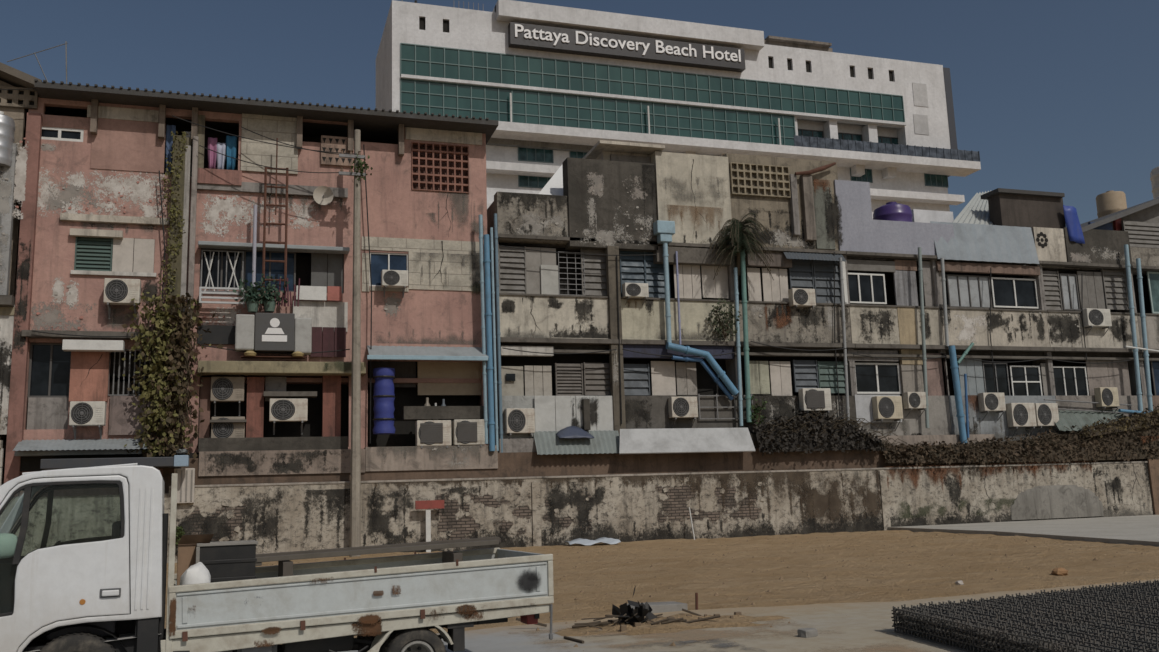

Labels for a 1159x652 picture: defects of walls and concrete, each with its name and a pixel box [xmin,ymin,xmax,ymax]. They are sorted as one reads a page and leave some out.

peeling [12,138,168,219]
peeling [198,193,319,239]
water stain [429,192,484,233]
water stain [499,192,568,237]
water stain [585,198,597,240]
water stain [0,238,31,429]
water stain [502,295,609,338]
water stain [758,302,895,343]
water stain [986,310,1081,343]
water stain [175,490,283,554]
water stain [304,489,350,548]
water stain [363,461,1154,552]